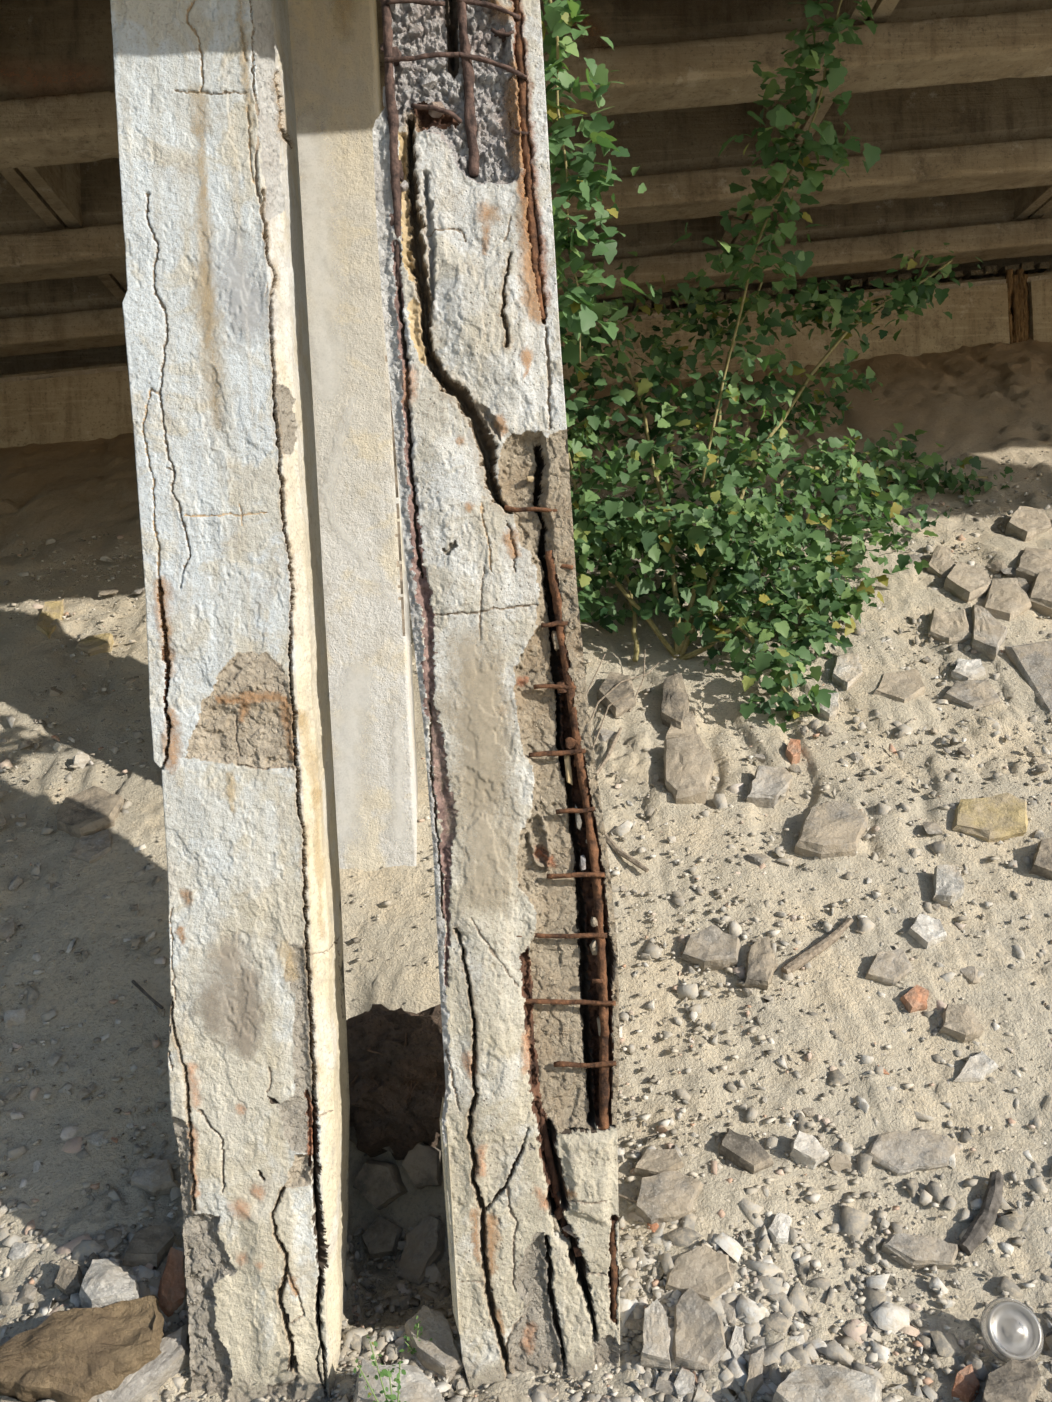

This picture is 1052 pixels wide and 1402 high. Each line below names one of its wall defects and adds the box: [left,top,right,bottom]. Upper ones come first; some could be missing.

water stain [205,945,258,1056]
spalling [185,651,294,769]
crack [142,0,344,1386]
spalling [338,1227,467,1402]
rust [390,240,459,987]
peeling [442,539,458,556]
spalling [382,0,521,185]
crack [385,116,537,641]
crack [445,917,525,1376]
rust [490,0,553,430]
crack [567,1198,607,1206]
spalling [498,429,1052,1402]